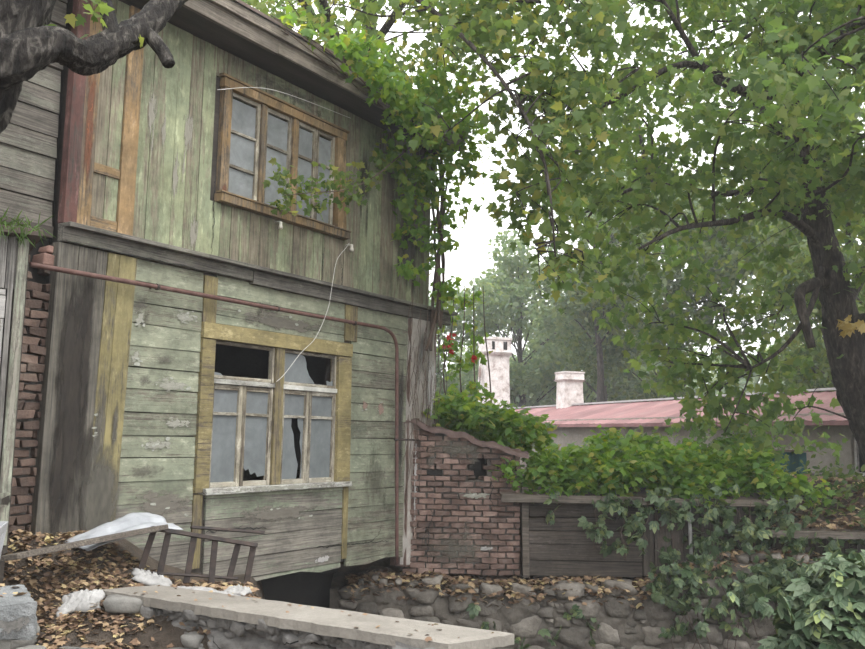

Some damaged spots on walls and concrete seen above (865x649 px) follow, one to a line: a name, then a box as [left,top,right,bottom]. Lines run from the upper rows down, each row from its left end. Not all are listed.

leakage [50,278,119,534]